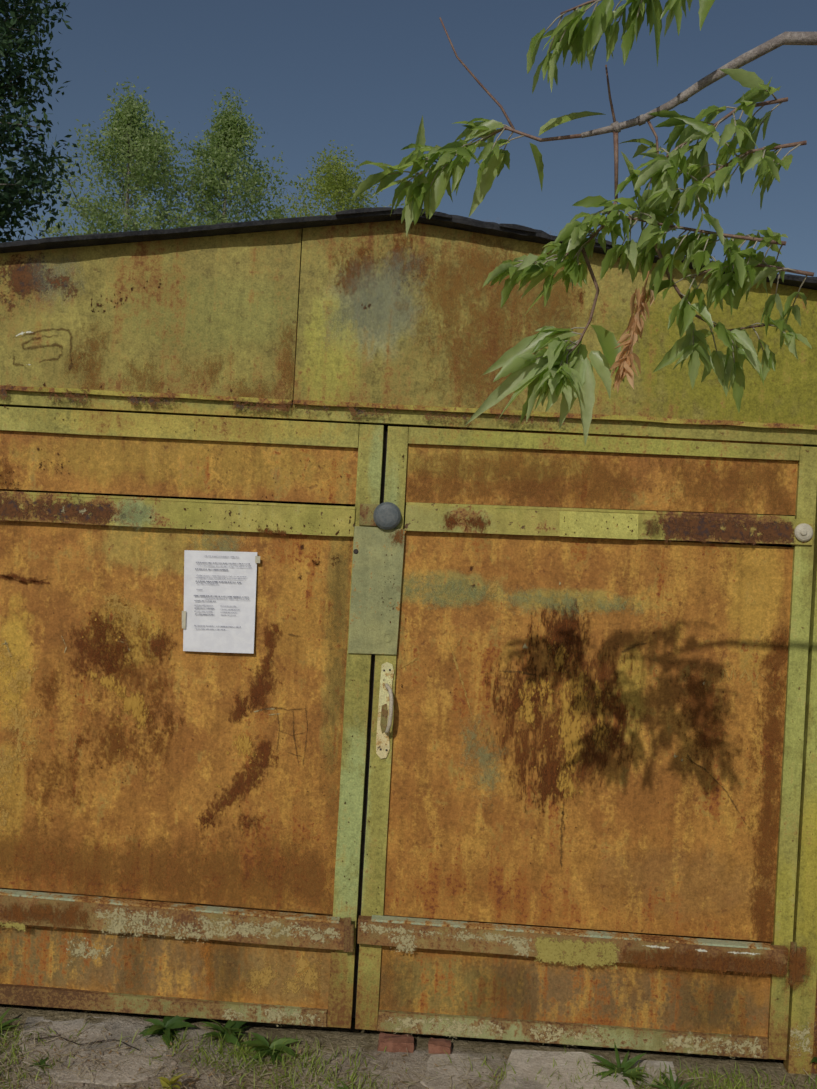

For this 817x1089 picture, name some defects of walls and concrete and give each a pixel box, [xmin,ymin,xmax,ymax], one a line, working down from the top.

corrosion [0,253,78,311]
corrosion [16,610,183,806]
corrosion [228,624,282,722]
corrosion [485,599,642,867]
corrosion [678,671,731,760]
corrosion [196,738,283,832]
corrosion [747,628,789,942]
peeling [95,907,341,944]
peeling [360,909,535,957]
corrosion [619,946,817,990]